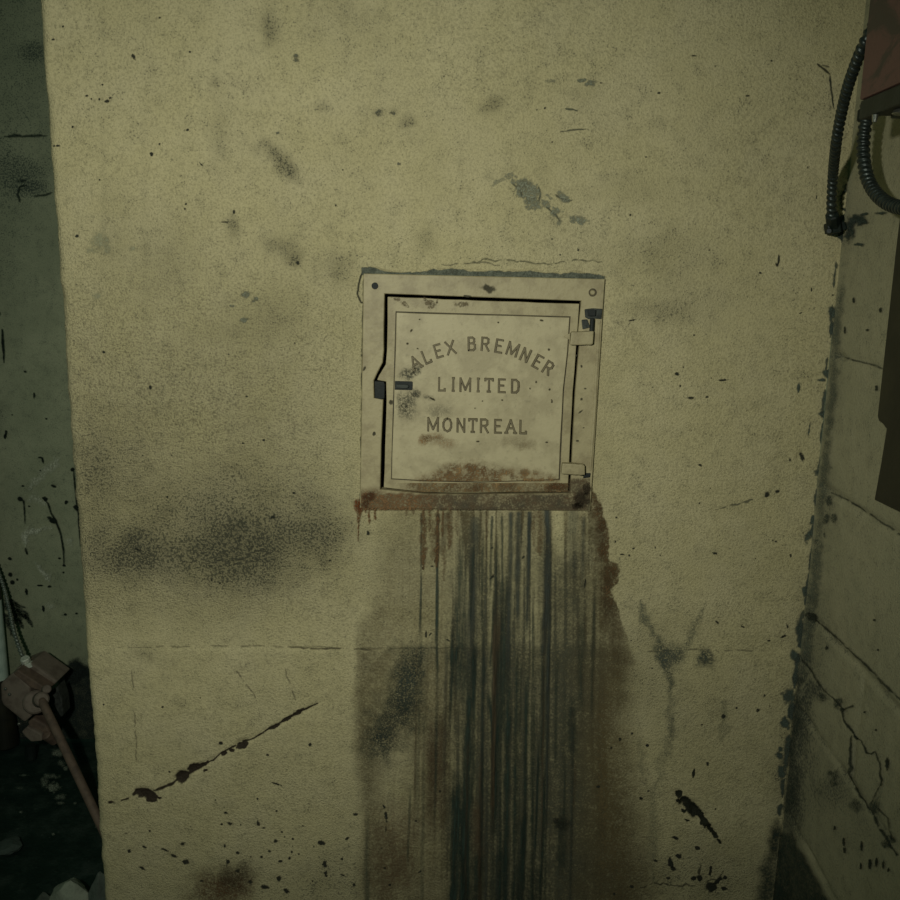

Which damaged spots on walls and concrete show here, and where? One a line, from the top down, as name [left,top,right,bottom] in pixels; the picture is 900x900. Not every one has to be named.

rust [354,463,620,621]
crack [108,694,318,803]
leakage [359,510,646,900]
crack [802,660,898,856]
crack [805,613,900,700]
leakage [759,826,827,900]